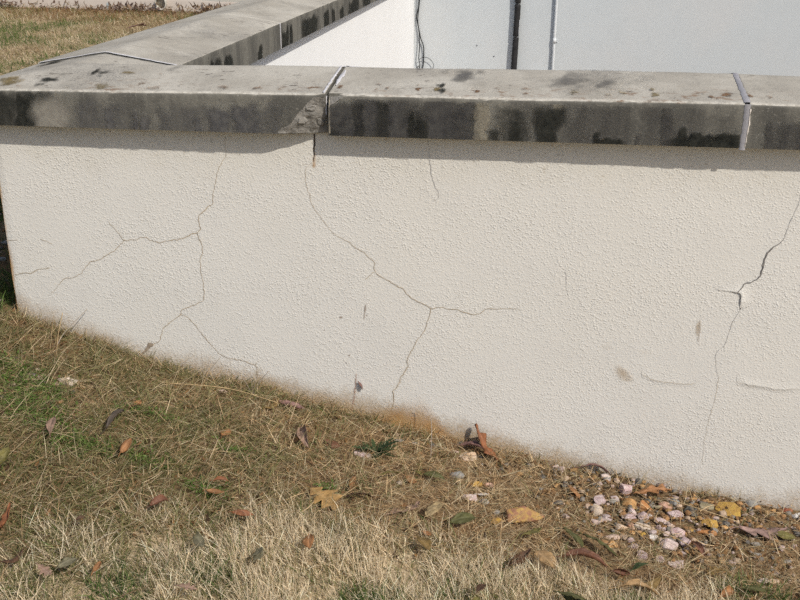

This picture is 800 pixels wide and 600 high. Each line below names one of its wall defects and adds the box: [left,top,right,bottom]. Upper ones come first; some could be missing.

leakage [282,0,377,48]
leakage [211,55,233,65]
leakage [0,92,69,127]
leakage [329,83,565,142]
leakage [594,112,623,144]
leakage [637,108,740,148]
crack [56,146,258,381]
crack [305,134,519,411]
crack [702,200,800,464]